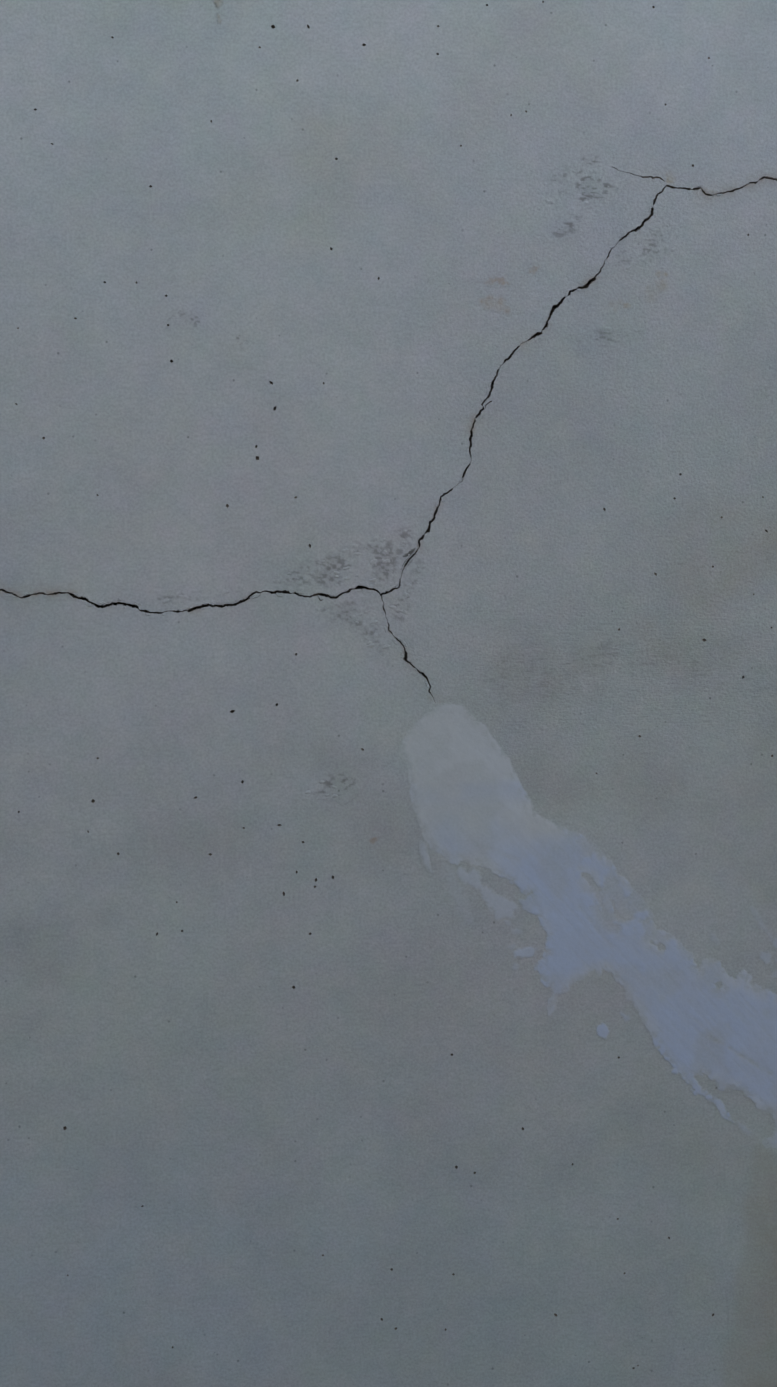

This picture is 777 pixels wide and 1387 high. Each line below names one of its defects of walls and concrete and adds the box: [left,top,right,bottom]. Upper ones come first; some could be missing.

crack [0,167,777,701]